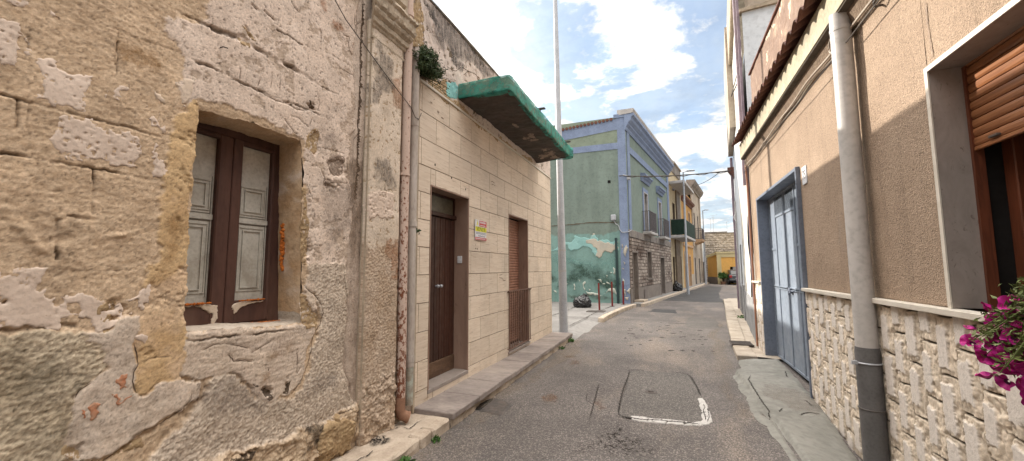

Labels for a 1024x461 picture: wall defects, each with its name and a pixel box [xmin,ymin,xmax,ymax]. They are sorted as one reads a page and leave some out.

flaking render [0,18,168,178]
flaking render [0,267,151,333]
peeling [184,304,218,324]
peeling [231,300,263,314]
spalling [253,381,291,401]
spalling [112,437,144,455]
spalling [230,451,256,461]